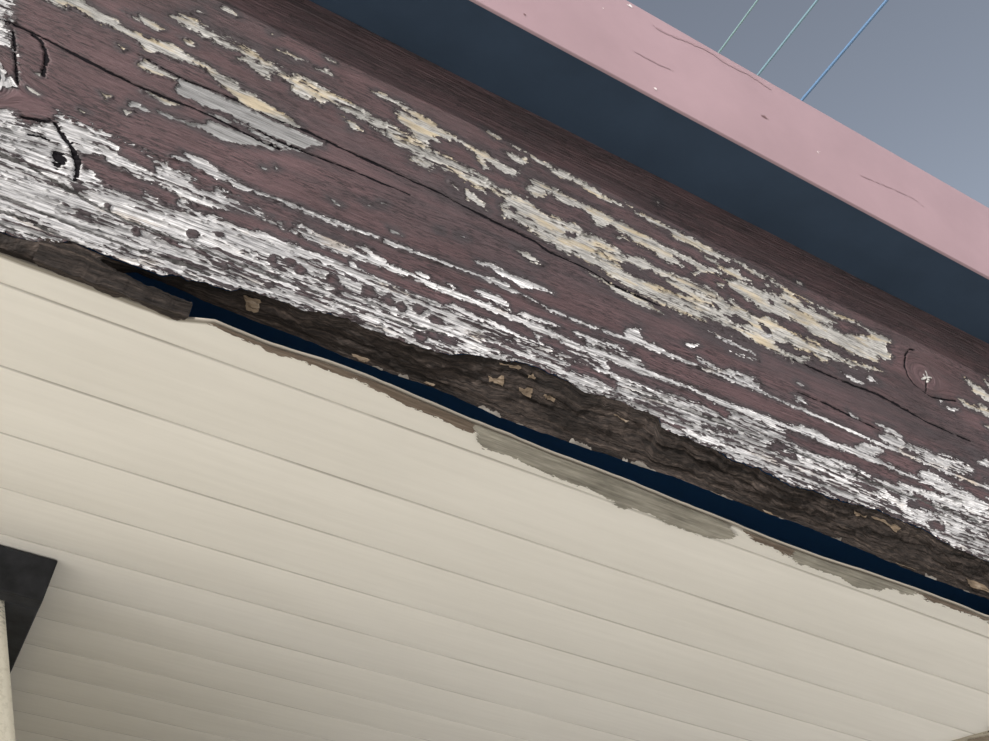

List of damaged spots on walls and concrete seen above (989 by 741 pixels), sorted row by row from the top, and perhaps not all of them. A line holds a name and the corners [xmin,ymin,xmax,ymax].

peeling [0,0,40,96]
crack [0,19,660,336]
peeling [46,0,892,384]
peeling [0,109,989,561]
peeling [207,323,989,624]
crack [789,357,971,442]